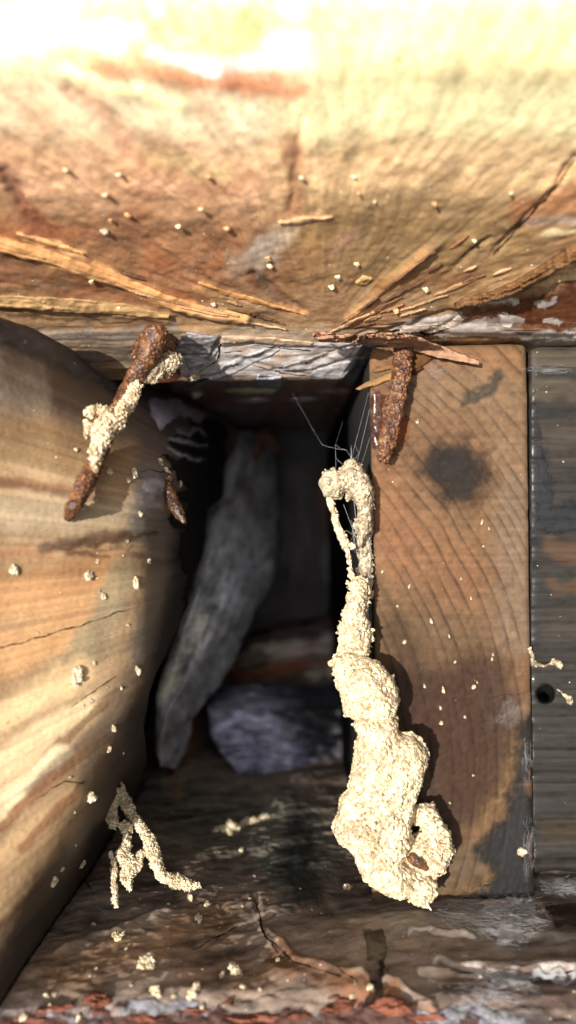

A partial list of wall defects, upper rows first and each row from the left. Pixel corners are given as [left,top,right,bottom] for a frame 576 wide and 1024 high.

rust [159,369,180,391]
rust [371,391,387,450]
rust [392,416,408,452]
water stain [422,445,491,501]
crack [0,610,127,648]